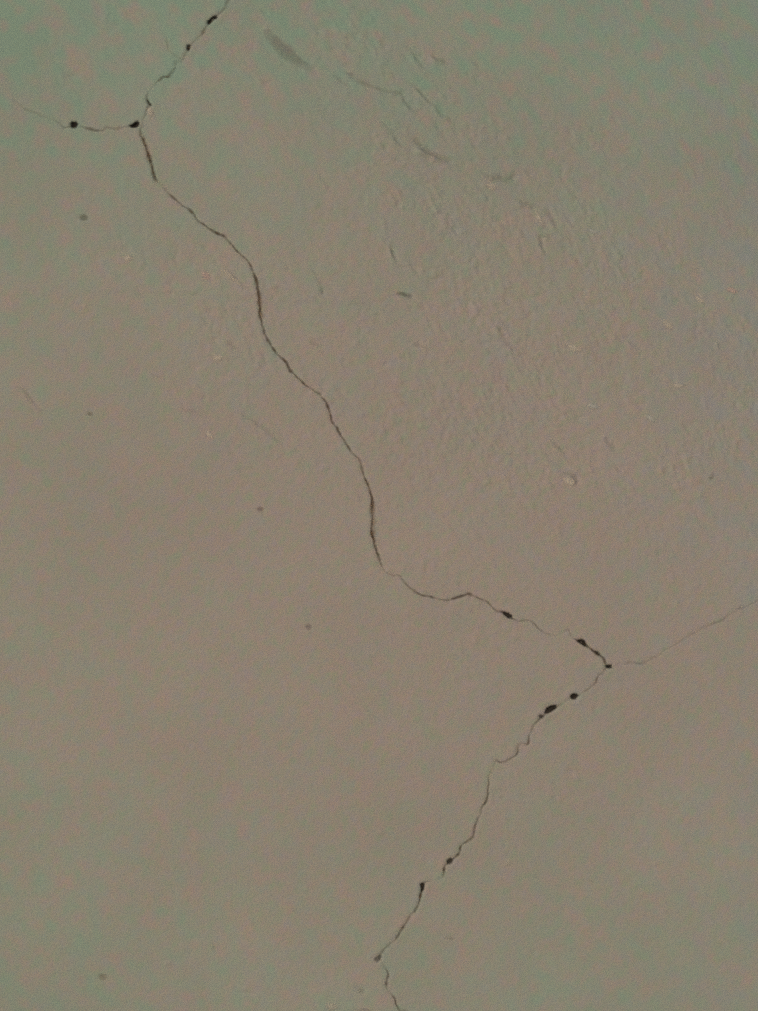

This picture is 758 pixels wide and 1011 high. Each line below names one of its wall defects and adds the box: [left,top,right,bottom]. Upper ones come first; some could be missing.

crack [130,100,154,174]
crack [576,639,612,669]
crack [539,693,579,718]
crack [419,841,467,902]